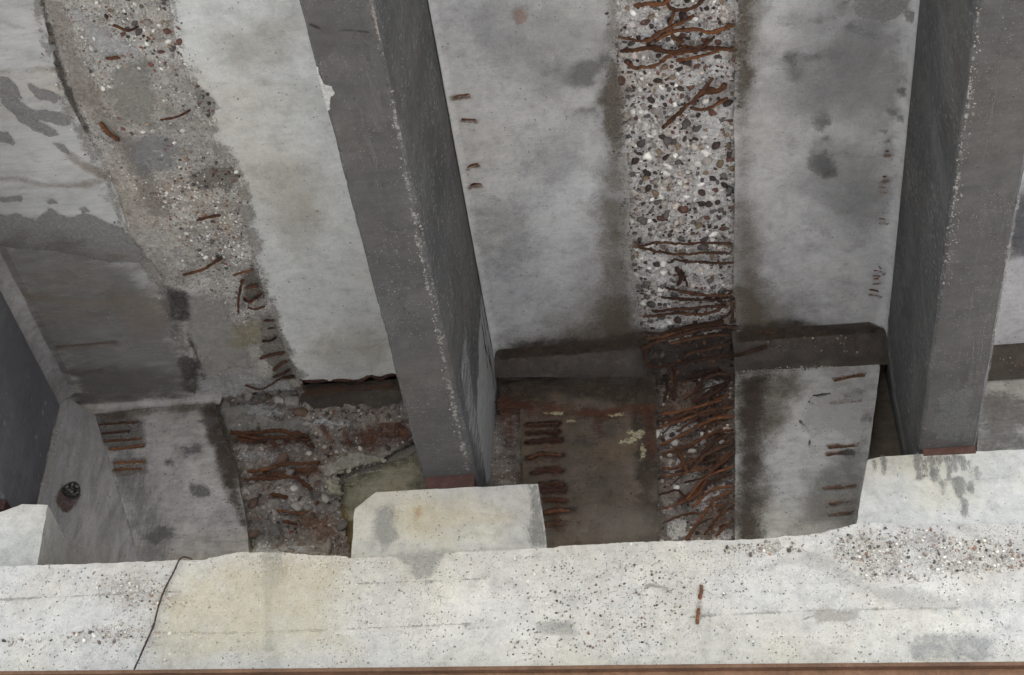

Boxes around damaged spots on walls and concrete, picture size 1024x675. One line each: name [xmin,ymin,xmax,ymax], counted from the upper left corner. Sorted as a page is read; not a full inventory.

water stain [544,54,612,86]
water stain [808,114,837,179]
water stain [0,231,248,526]
spalling [0,0,469,668]
spalling [500,0,1024,662]
water stain [732,269,1024,540]